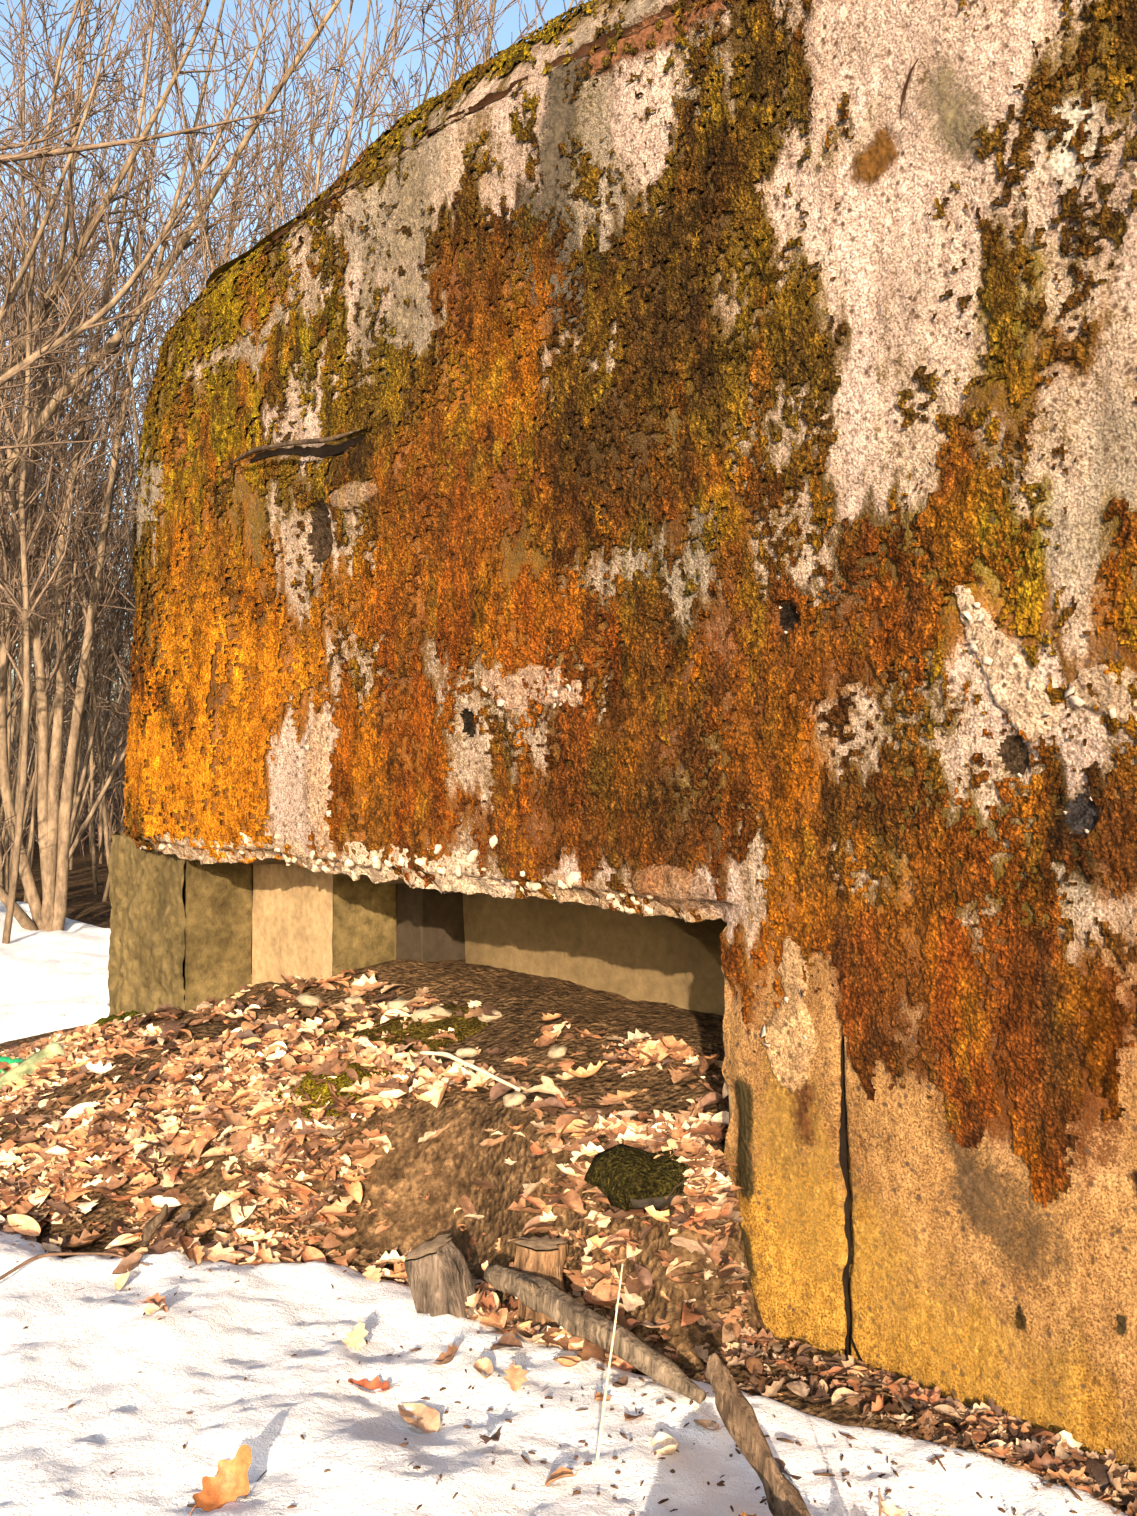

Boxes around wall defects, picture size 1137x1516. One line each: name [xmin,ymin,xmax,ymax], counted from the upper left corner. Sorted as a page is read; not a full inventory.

crack [839,1035,863,1362]